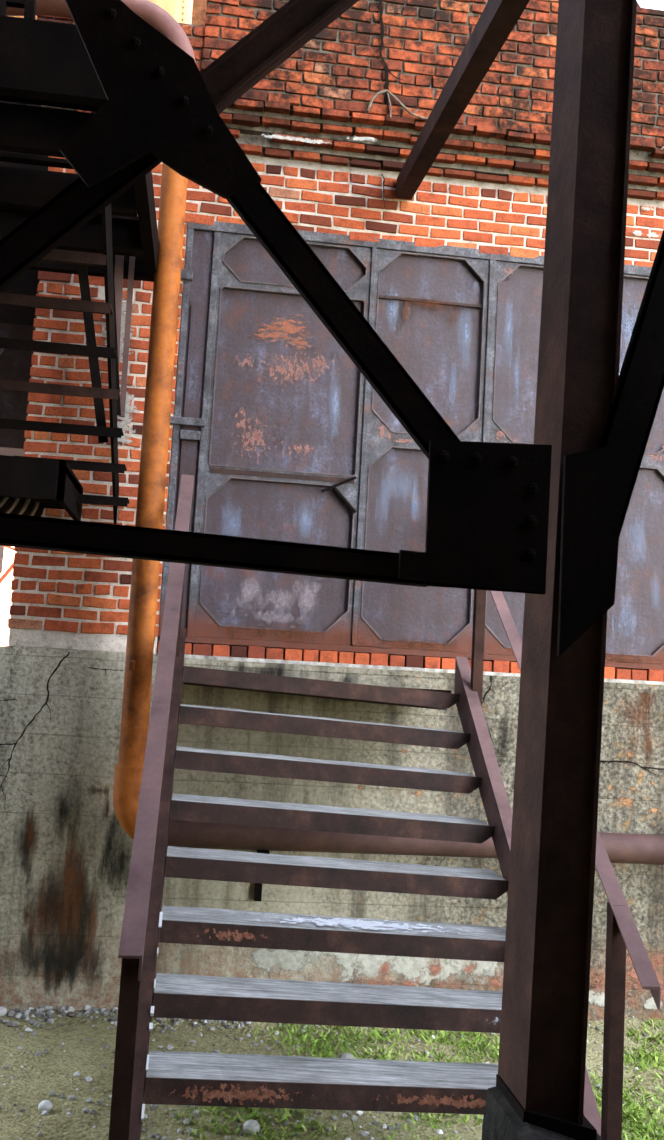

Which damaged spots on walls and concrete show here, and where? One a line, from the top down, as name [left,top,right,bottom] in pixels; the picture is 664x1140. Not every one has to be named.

crack [0,652,123,808]
rust [627,694,652,759]
crack [600,760,664,775]
damp [20,815,32,869]
damp [59,798,69,834]
damp [103,818,128,883]
damp [22,852,97,983]
rust [193,928,268,942]